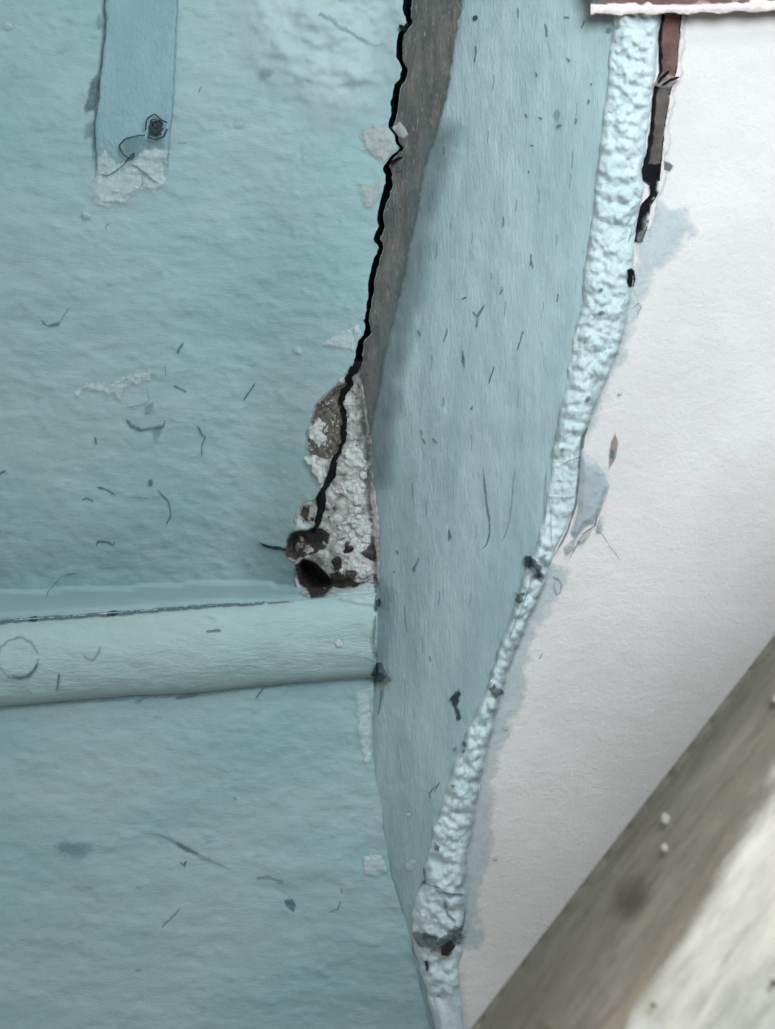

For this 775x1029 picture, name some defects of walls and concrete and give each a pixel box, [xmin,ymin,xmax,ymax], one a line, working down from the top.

peeling [259,0,462,604]
crack [310,0,413,534]